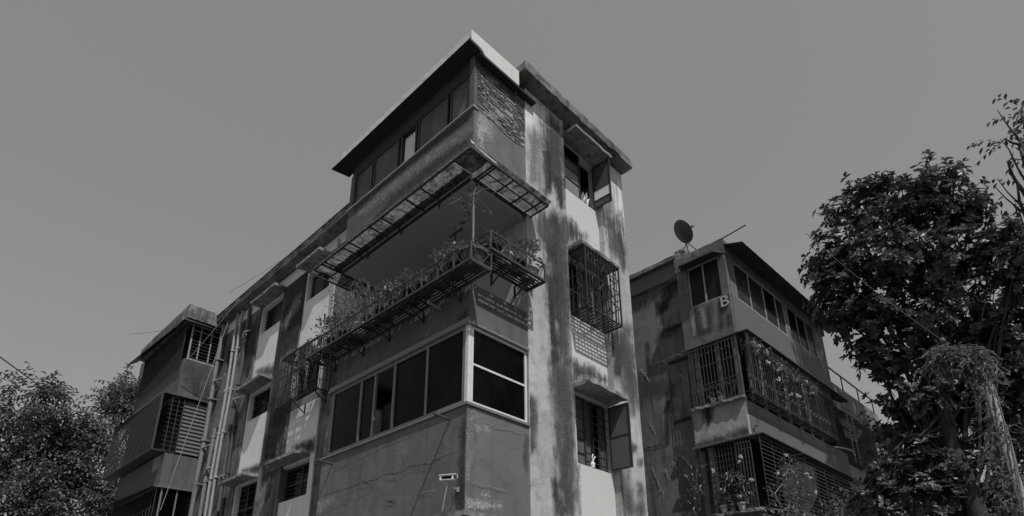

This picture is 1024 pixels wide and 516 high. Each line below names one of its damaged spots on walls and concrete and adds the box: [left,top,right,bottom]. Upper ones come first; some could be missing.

damp [524,393,537,459]
damp [527,114,678,516]